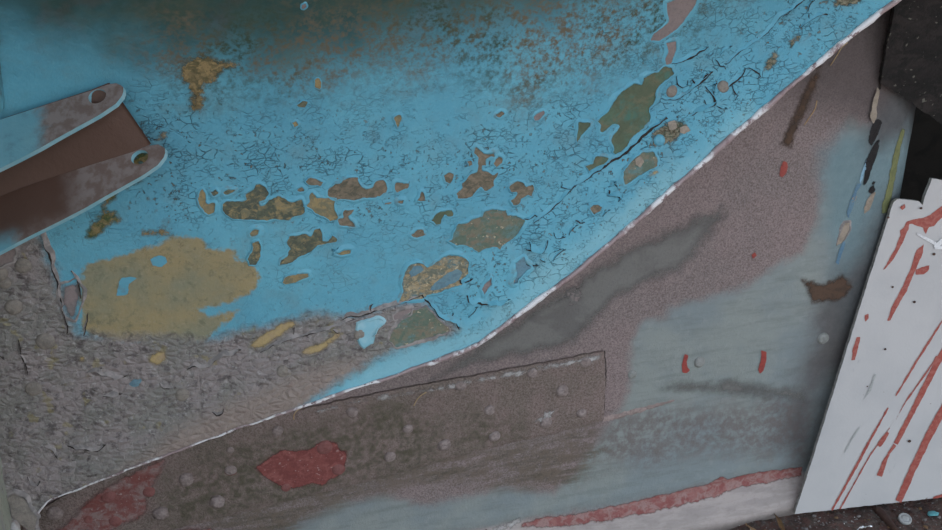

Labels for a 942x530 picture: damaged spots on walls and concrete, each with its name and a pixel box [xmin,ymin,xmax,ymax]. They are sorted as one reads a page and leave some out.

peeling [575,0,699,188]
crack [523,0,828,267]
corrosion [783,66,820,148]
peeling [117,277,136,296]
peeling [150,256,167,267]
peeling [195,174,428,285]
peeling [355,142,535,349]
damp [449,214,721,371]
peeling [251,321,295,348]
peeling [256,441,347,488]
peeling [486,467,802,530]